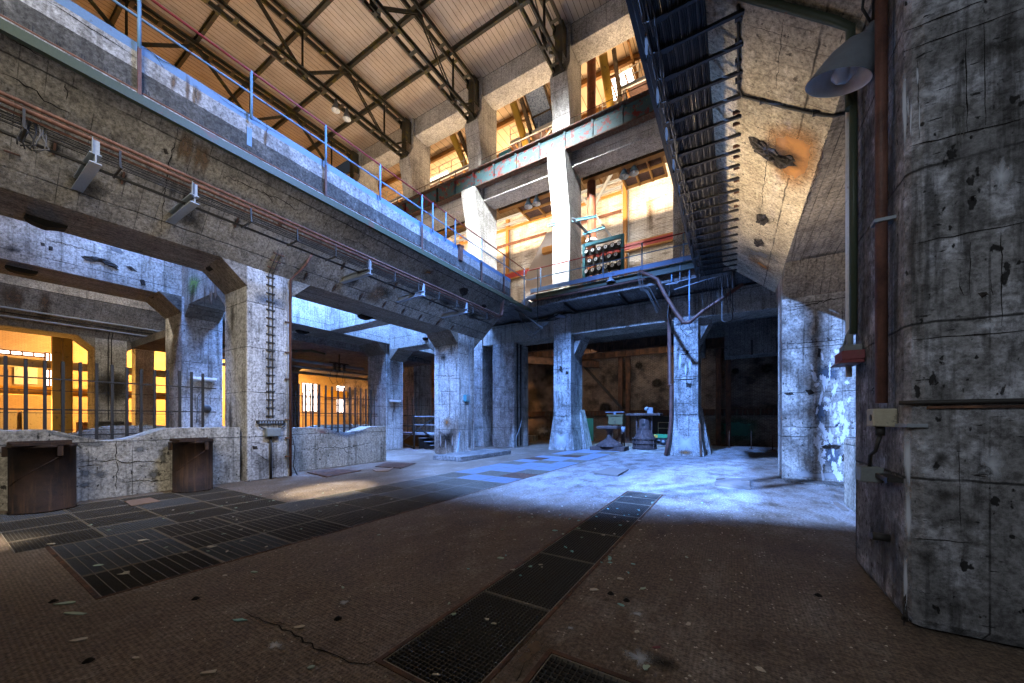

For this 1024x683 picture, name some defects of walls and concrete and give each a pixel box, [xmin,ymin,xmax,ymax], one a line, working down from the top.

crack [1,73,70,113]
spalling [748,136,796,169]
corrosion [771,130,813,182]
spalling [81,256,146,286]
peeling [784,348,851,482]
crack [242,611,383,664]